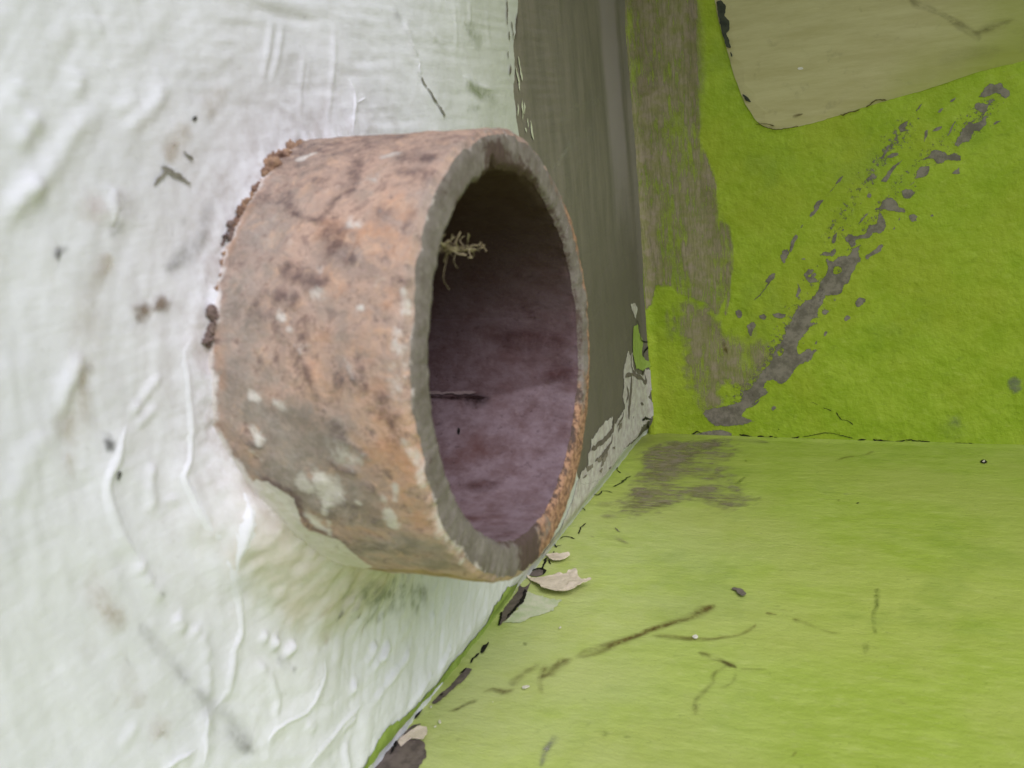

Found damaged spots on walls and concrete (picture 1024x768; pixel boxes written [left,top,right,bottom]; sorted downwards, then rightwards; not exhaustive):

peeling [716,0,732,57]
peeling [697,83,1010,436]
peeling [543,303,654,560]
peeling [503,591,562,623]
peeling [375,725,427,768]